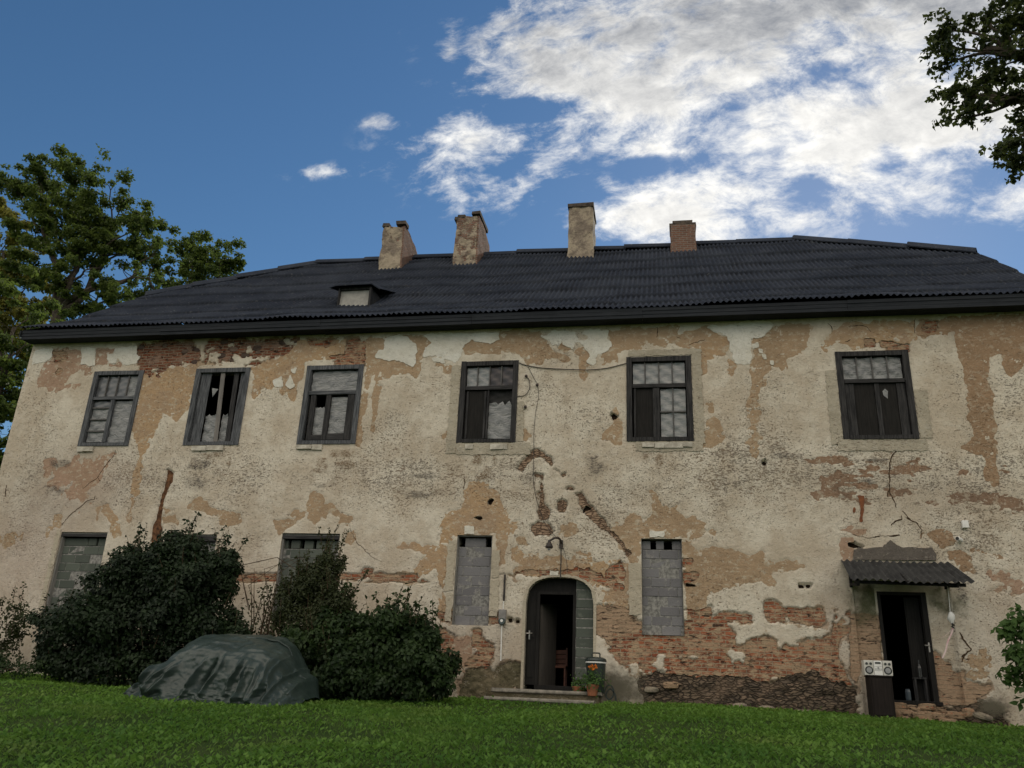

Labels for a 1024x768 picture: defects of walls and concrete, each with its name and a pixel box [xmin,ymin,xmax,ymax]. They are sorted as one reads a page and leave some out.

corrosion [151,470,174,543]
peeling [37,334,431,546]
flaking render [338,428,882,713]
peeling [462,322,814,465]
crack [853,451,922,538]
peeling [804,313,1024,514]